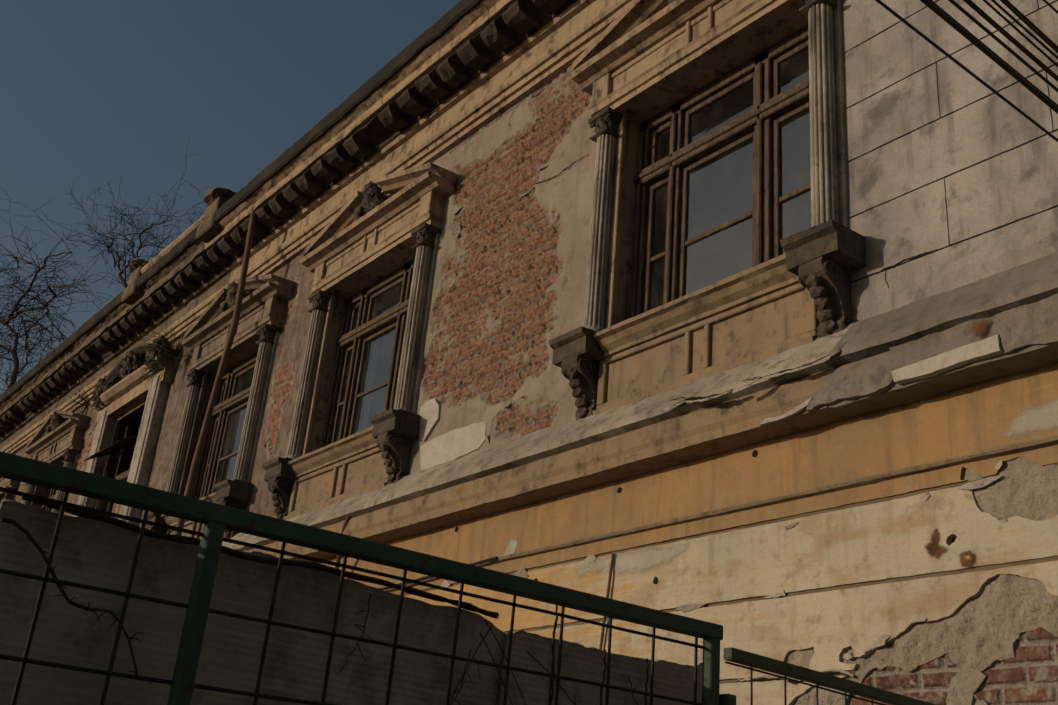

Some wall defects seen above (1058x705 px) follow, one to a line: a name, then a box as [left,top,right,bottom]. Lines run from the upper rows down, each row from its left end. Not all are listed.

flaking render [420,68,592,443]
flaking render [264,362,296,461]
peeling [1007,400,1058,436]
flaking render [957,457,1058,523]
rust [925,529,947,558]
rust [960,551,976,568]
flaking render [781,574,1058,705]